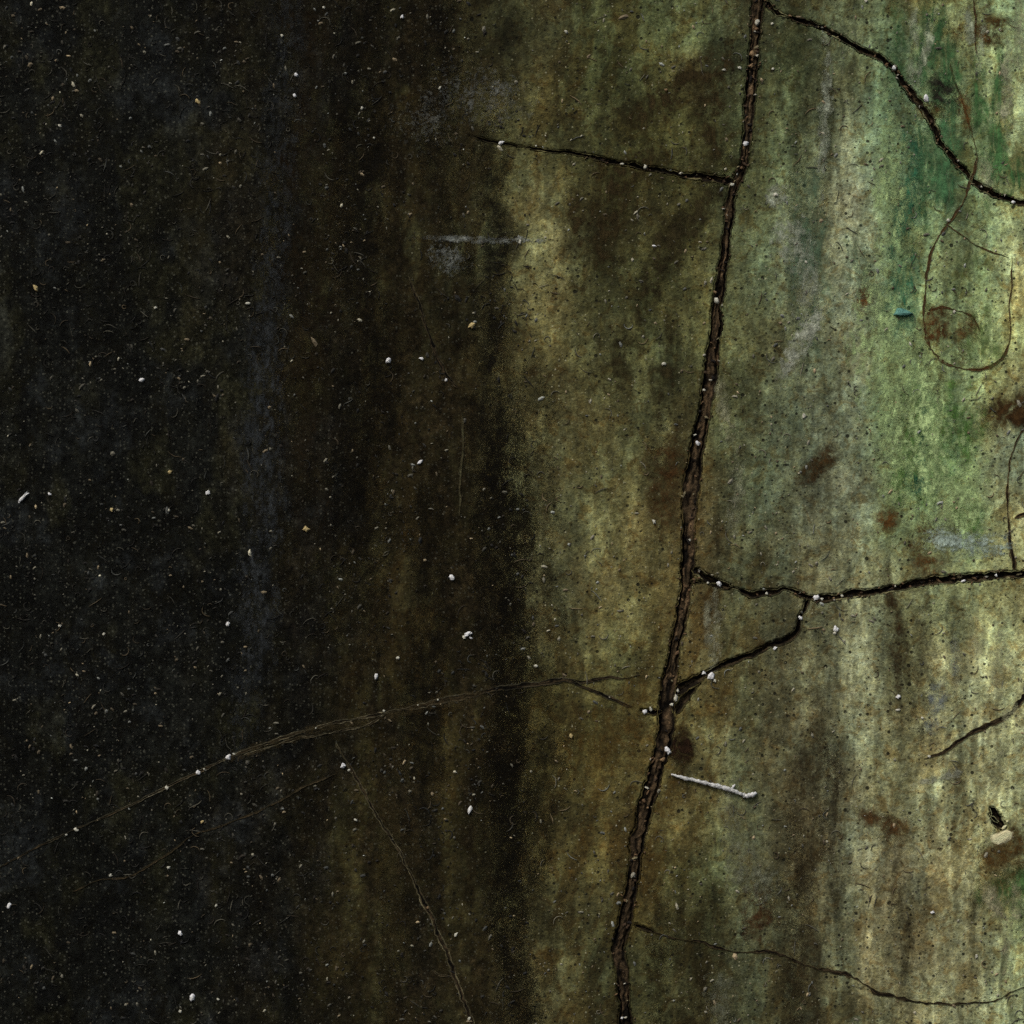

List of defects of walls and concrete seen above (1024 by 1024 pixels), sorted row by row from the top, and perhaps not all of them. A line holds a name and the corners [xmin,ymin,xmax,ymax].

leakage [0,0,545,1024]
crack [470,0,1024,1024]
corrosion [802,444,839,483]
corrosion [924,308,977,344]